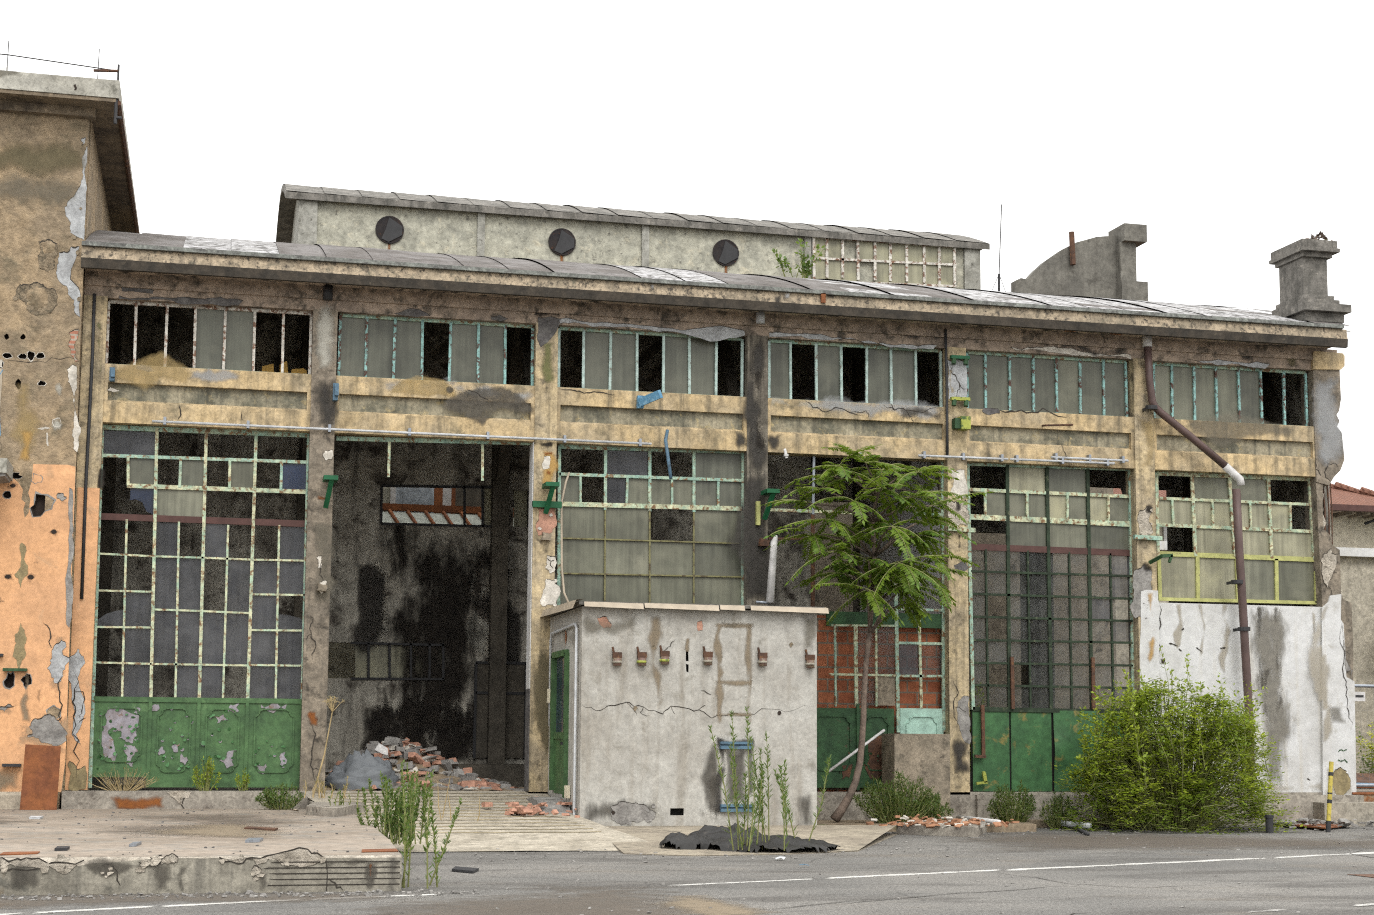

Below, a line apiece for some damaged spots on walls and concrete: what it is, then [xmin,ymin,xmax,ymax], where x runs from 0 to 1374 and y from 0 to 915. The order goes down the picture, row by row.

peeling [13,137,87,452]
spalling [1321,549,1337,588]
peeling [20,488,239,791]
crack [585,690,813,718]
damp [714,624,752,720]
damp [1254,608,1290,789]
damp [1310,617,1341,739]
damp [703,739,753,812]
spalling [611,801,656,825]
spalling [0,854,84,875]
spalling [135,853,178,873]
spalling [219,847,326,881]